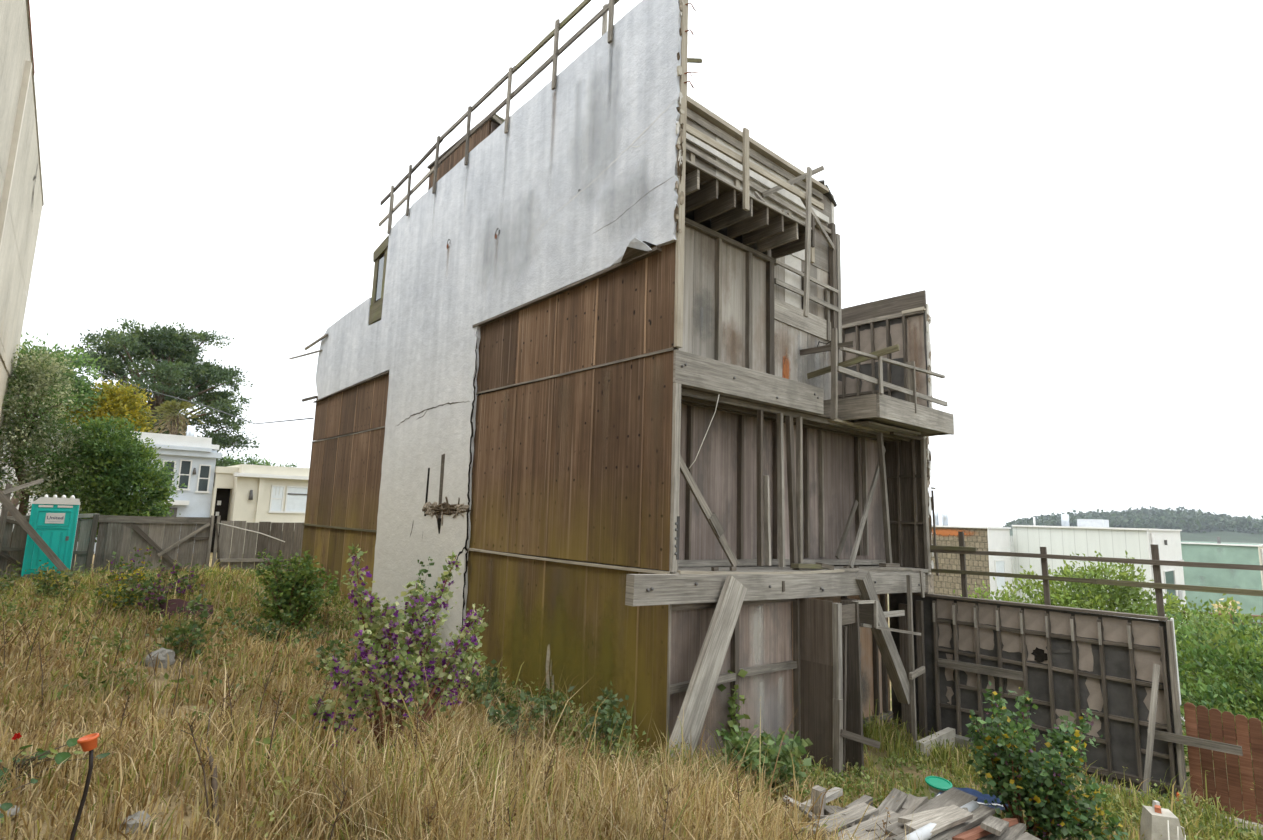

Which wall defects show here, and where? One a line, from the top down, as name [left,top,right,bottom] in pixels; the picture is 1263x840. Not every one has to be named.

peeling [679,0,697,37]
peeling [674,52,702,233]
corrosion [782,356,790,379]
crack [401,331,477,628]